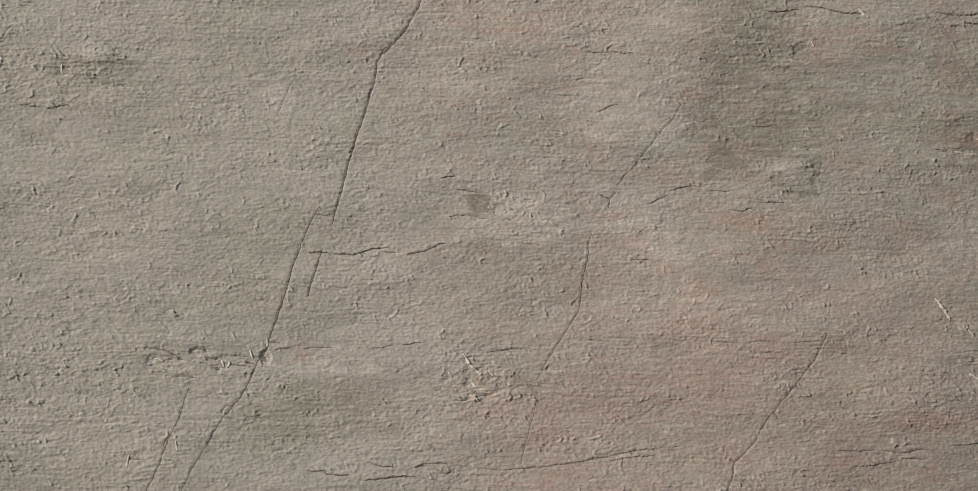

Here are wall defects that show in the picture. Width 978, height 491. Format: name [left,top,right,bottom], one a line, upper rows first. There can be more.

crack [599,104,681,207]
crack [181,0,443,491]
crack [539,233,592,375]
crack [306,400,681,481]
crack [727,332,827,491]